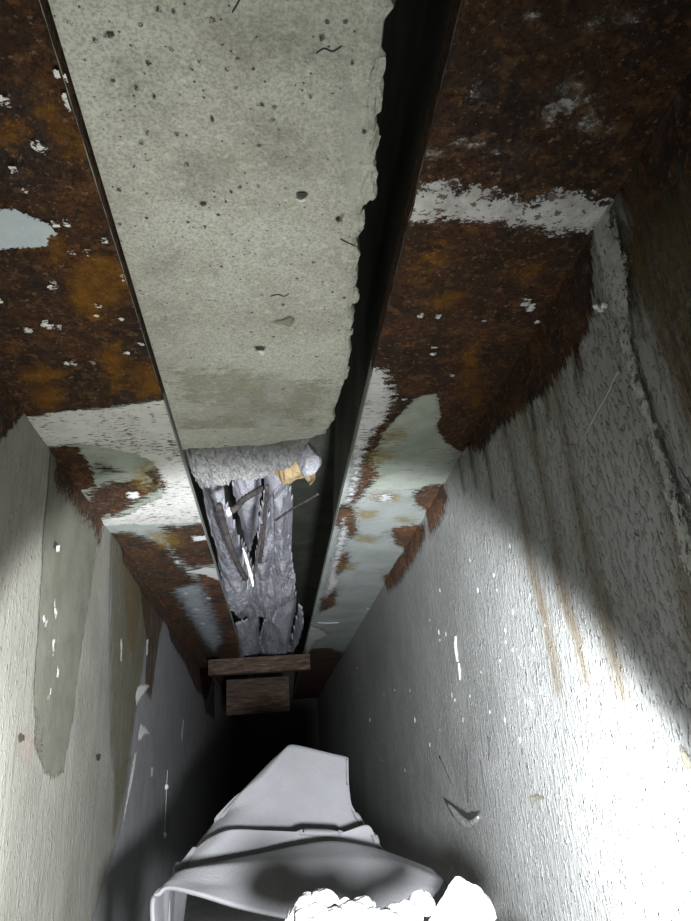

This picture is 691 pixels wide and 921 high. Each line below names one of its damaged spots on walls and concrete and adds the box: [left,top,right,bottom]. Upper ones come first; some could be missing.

corrosion [0,0,164,442]
corrosion [364,0,691,498]
peeling [19,400,319,781]
corrosion [120,546,250,719]
corrosion [383,483,449,592]